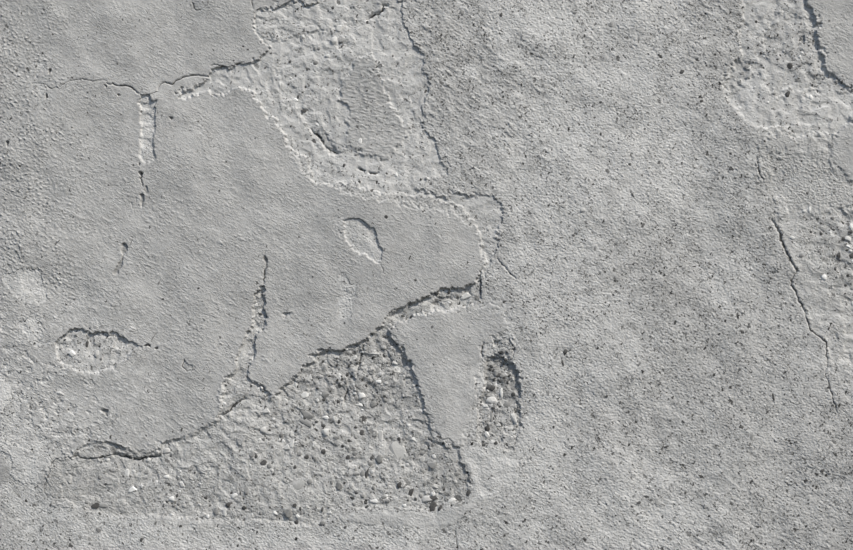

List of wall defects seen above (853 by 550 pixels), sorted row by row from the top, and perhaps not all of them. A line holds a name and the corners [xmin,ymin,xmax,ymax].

spalling [0,0,504,528]
spalling [475,337,523,454]
spalling [722,0,853,368]
crack [773,222,836,405]